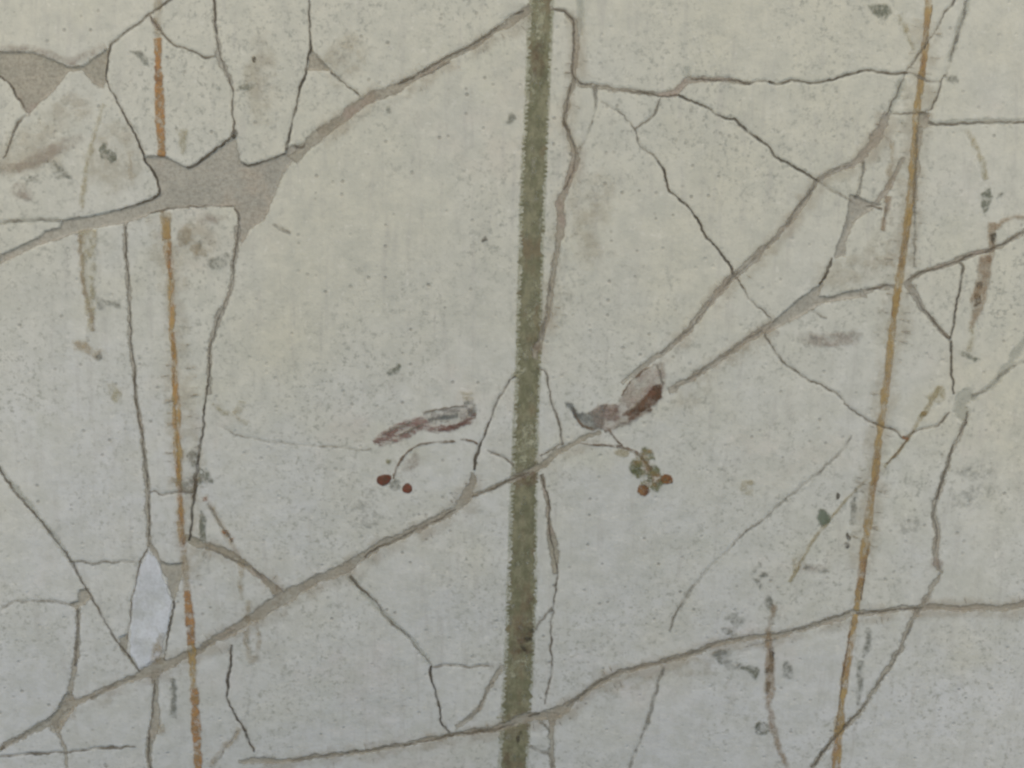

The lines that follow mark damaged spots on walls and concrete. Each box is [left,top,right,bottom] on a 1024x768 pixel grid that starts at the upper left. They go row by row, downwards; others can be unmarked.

crack [244,0,359,166]
crack [398,10,524,84]
crack [940,0,966,50]
crack [0,0,256,768]
crack [553,8,1024,768]
crack [349,544,387,601]
crack [389,368,607,768]